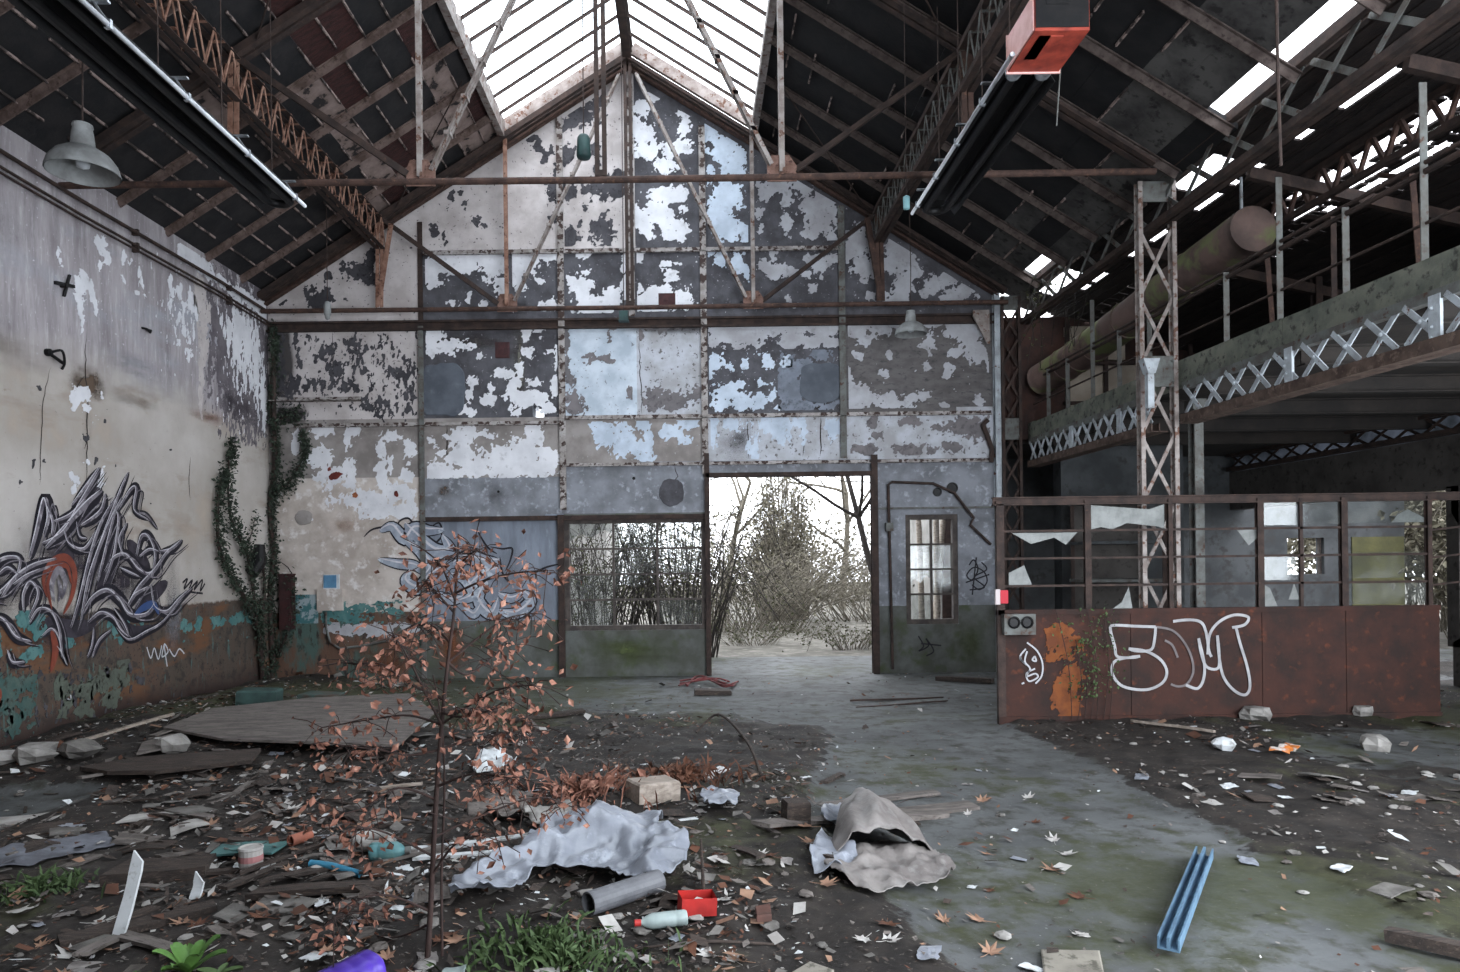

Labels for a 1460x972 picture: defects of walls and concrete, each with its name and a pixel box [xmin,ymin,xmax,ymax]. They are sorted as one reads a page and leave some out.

peeling [56,92,990,520]
rust [1043,622,1089,716]